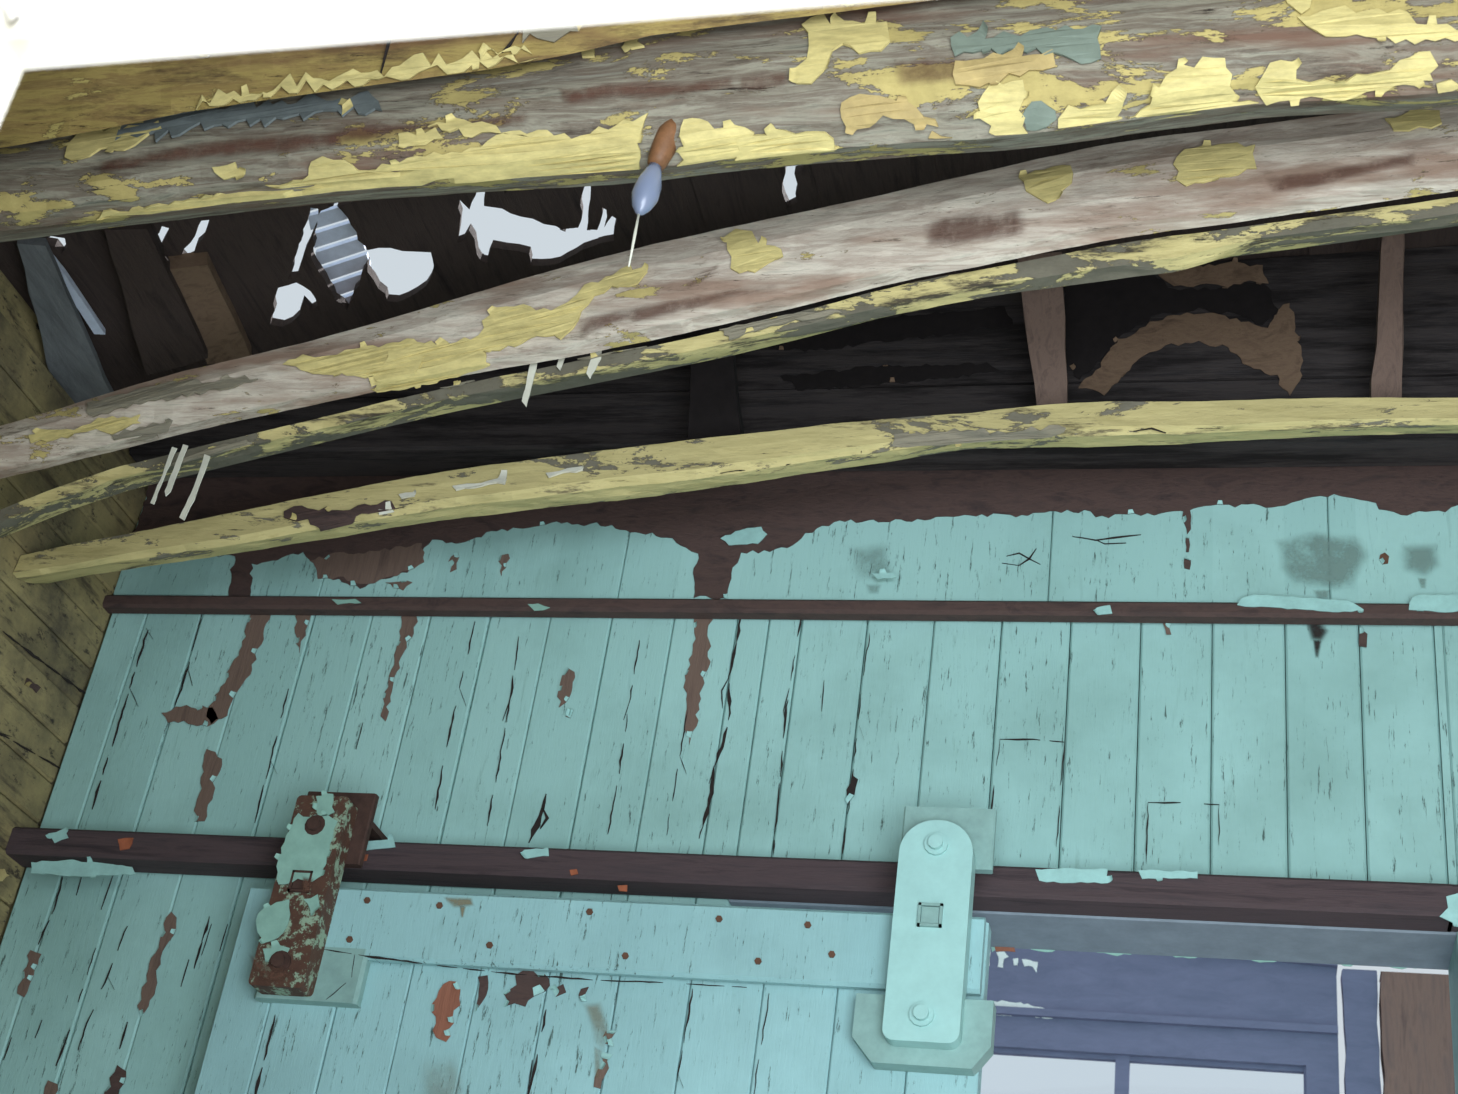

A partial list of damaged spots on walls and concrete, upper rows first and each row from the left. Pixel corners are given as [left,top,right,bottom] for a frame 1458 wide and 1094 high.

peeling [62,25,583,161]
peeling [96,113,648,221]
peeling [676,94,953,167]
peeling [789,12,890,84]
peeling [950,0,1458,136]
peeling [283,262,648,393]
peeling [132,440,1458,605]
peeling [162,615,271,727]
peeling [683,619,713,745]
peeling [194,749,222,822]
rust [118,838,133,850]
peeling [431,971,589,1042]